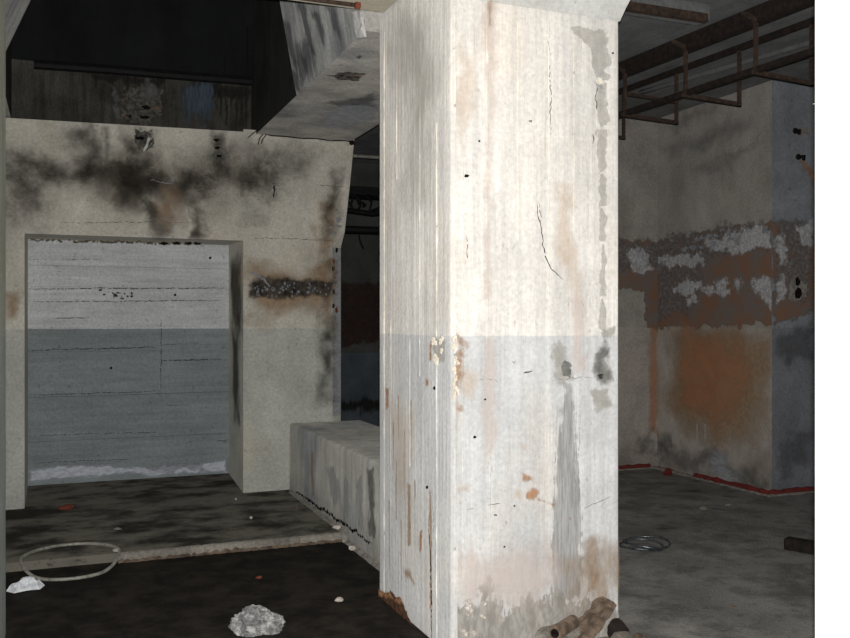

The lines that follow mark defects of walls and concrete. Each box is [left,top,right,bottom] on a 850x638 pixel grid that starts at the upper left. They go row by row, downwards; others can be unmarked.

crack [537,204,561,278]
peeling [618,218,815,332]
peeling [255,247,380,415]
peeling [431,336,445,365]
damp [592,347,611,409]
corrosion [401,485,422,551]
corrosion [523,475,538,499]
damp [552,385,593,601]